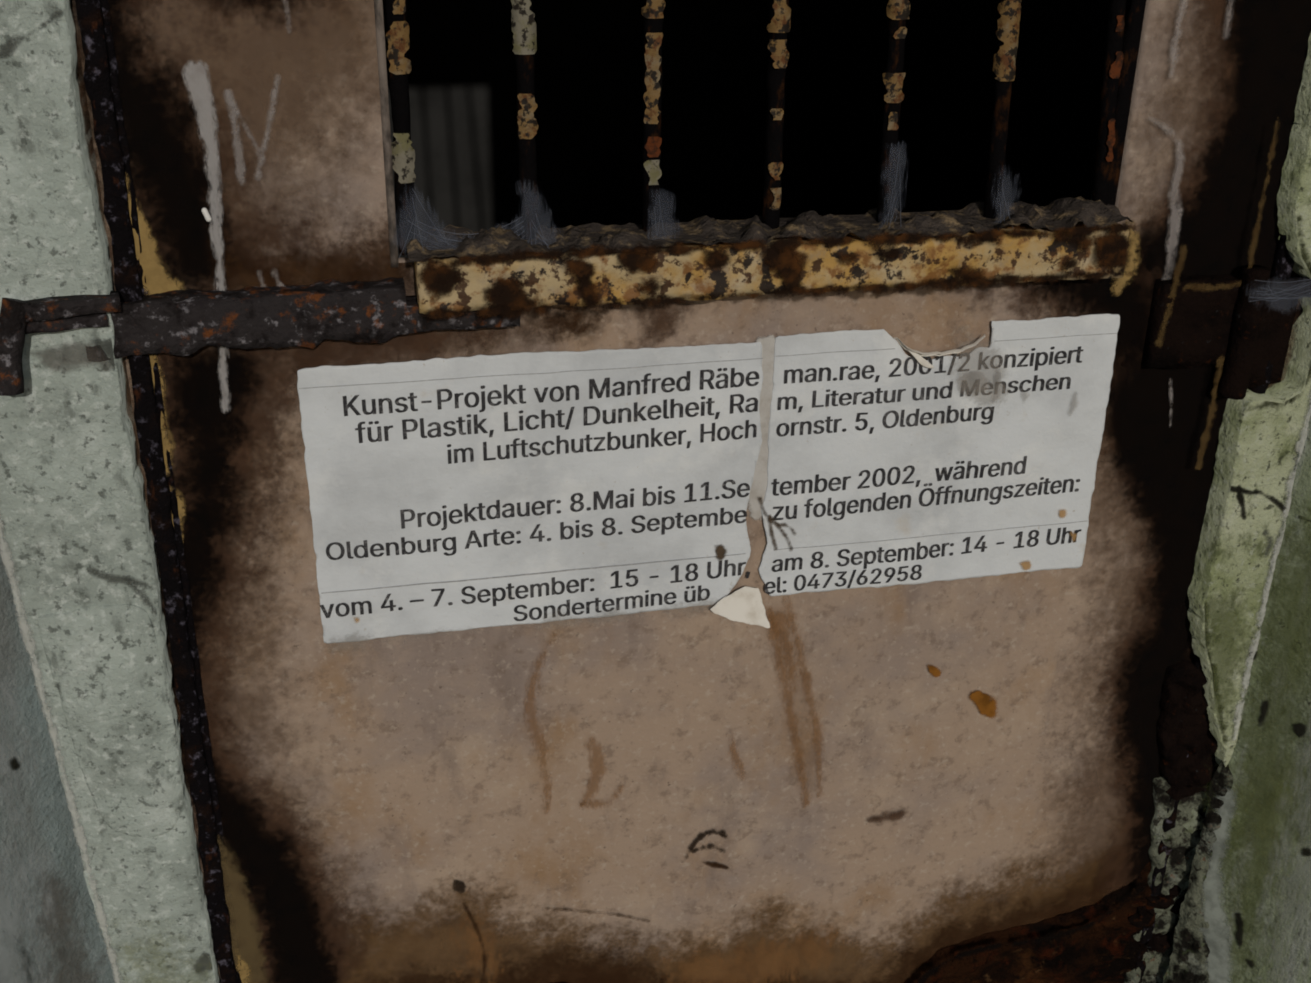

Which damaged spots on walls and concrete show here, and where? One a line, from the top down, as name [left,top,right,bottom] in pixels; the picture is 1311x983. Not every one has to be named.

damp [185,62,224,291]
corrosion [121,0,380,259]
corrosion [194,2,1228,414]
damp [1163,126,1183,280]
damp [219,346,229,412]
corrosion [198,569,284,808]
corrosion [339,405,1161,983]
spalling [1124,603,1233,983]